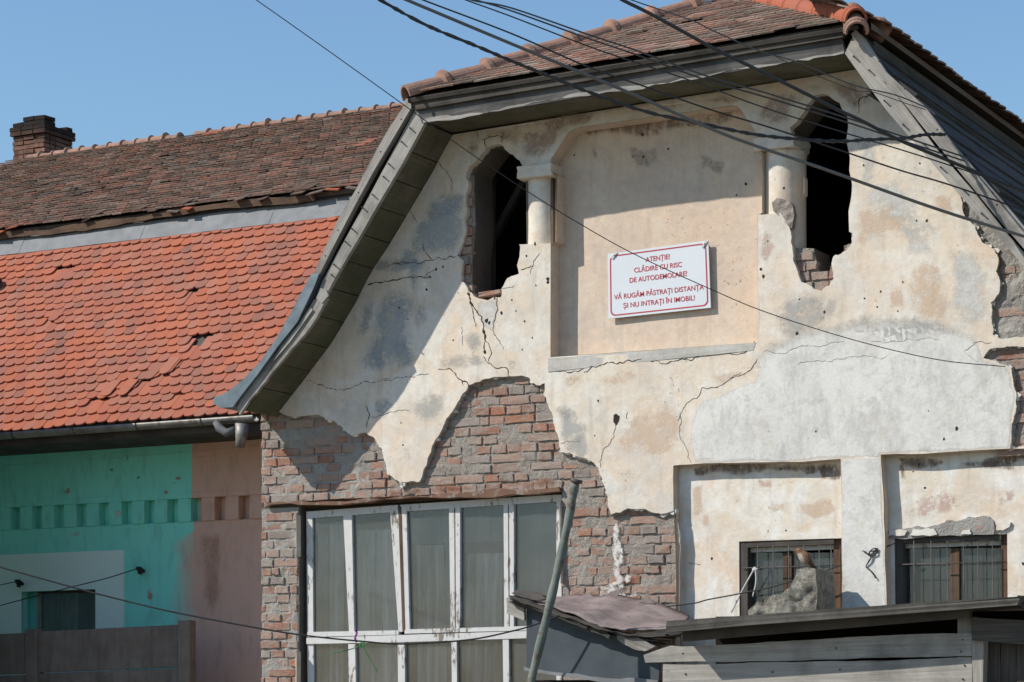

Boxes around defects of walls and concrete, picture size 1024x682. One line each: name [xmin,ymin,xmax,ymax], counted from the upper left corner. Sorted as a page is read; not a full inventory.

crack [367,213,457,285]
flaking render [772,187,797,229]
crack [461,257,537,377]
crack [306,368,469,423]
crack [556,337,938,462]
peeling [691,198,1024,608]
flaking render [261,376,683,682]